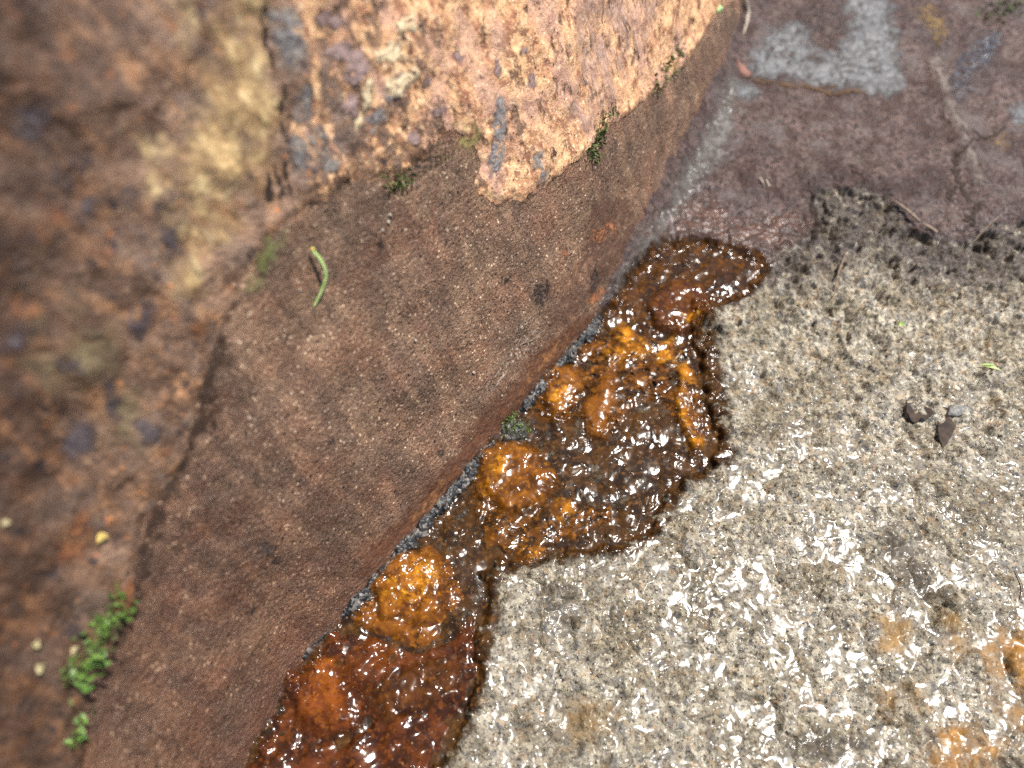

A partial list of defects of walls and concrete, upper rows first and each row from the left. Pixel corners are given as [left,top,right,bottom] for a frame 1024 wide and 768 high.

corrosion [0,0,527,768]
corrosion [246,195,811,768]
corrosion [509,0,701,198]